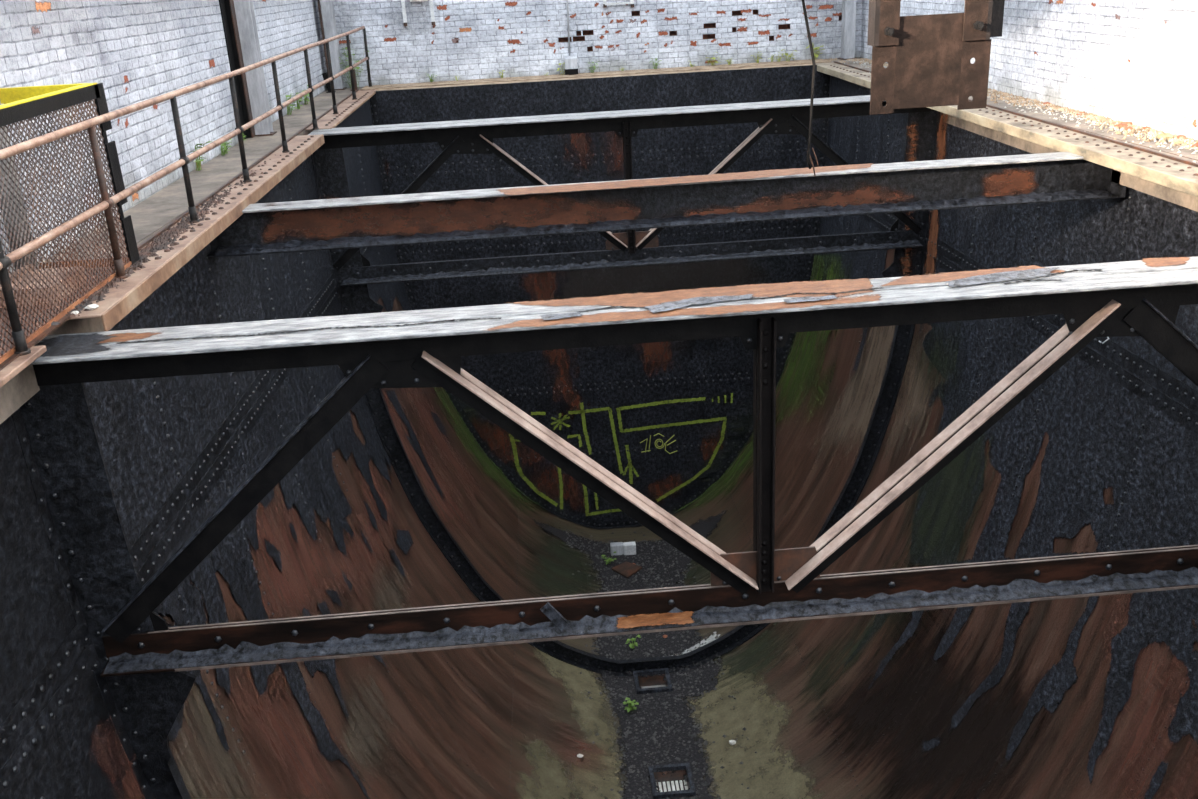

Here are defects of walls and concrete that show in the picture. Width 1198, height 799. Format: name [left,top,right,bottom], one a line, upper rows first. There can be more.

corrosion [97,332,161,344]
peeling [34,243,341,357]
peeling [255,155,319,204]
corrosion [262,131,874,242]
corrosion [488,210,1064,330]
corrosion [686,186,913,231]
peeling [936,112,1033,160]
peeling [920,315,1061,435]
corrosion [984,170,1035,197]
peeling [923,187,1198,287]
corrosion [1142,257,1190,267]
peeling [909,336,1198,566]